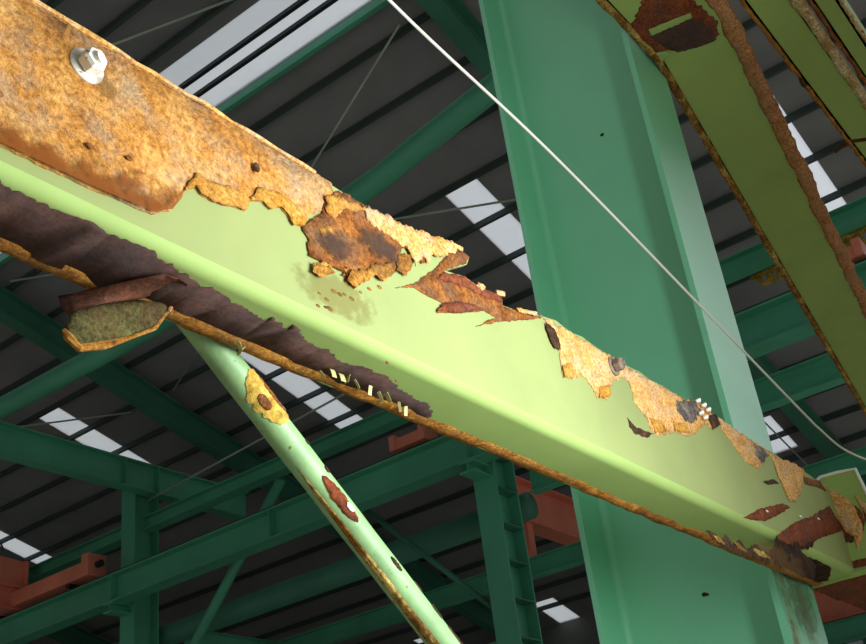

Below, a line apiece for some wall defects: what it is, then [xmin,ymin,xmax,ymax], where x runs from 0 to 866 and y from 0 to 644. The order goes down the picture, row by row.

peeling [0,180,433,419]
rust [298,470,440,644]
rust [0,0,866,502]
rust [0,237,866,611]